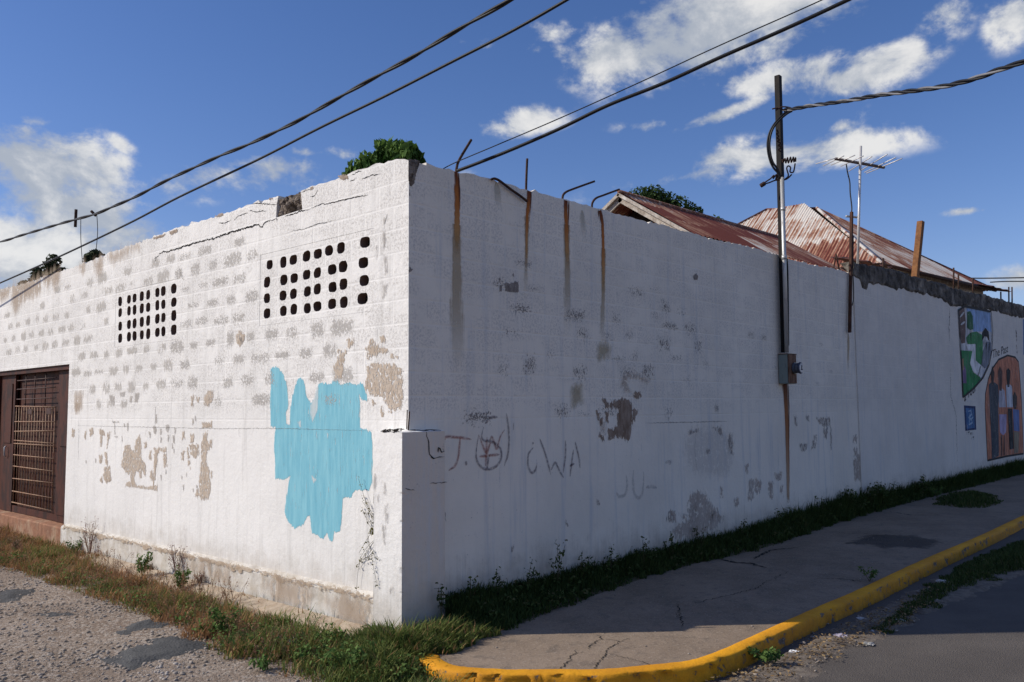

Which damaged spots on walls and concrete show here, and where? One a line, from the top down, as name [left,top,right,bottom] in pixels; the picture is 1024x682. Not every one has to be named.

crack [154,171,377,261]
spalling [269,186,313,220]
rust [452,172,463,317]
peeling [71,391,213,501]
peeling [333,335,403,417]
peeling [596,391,642,443]
rust [782,384,790,499]